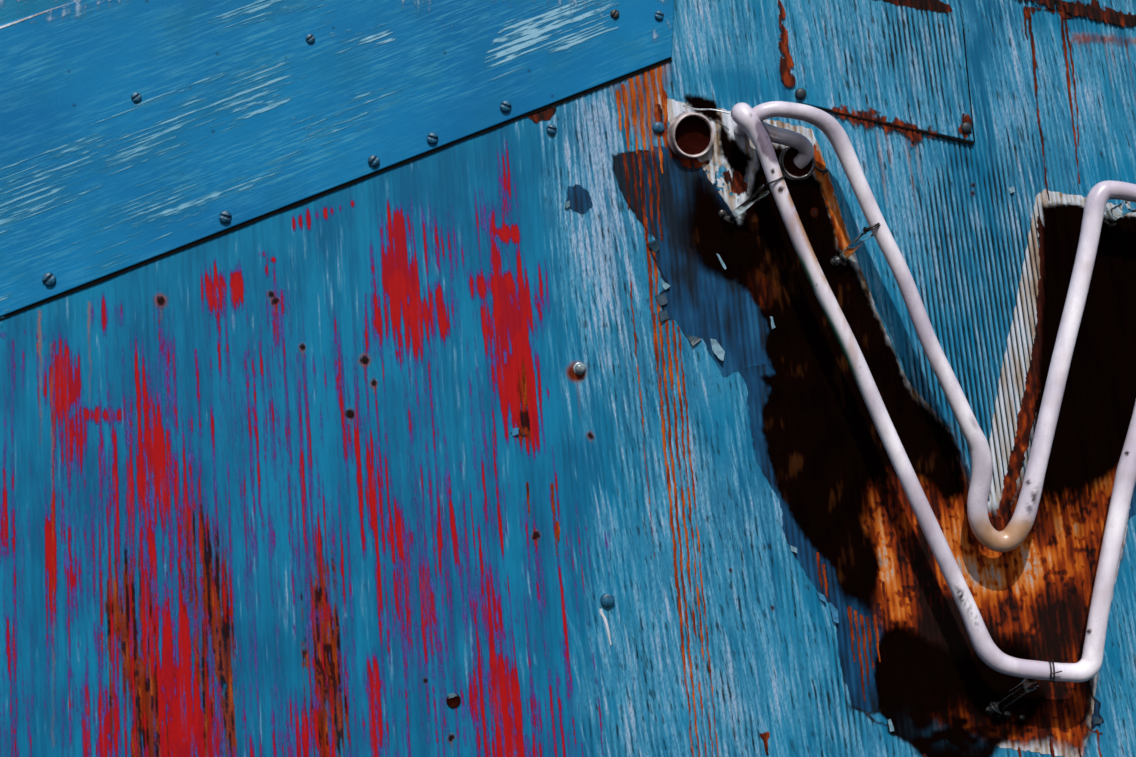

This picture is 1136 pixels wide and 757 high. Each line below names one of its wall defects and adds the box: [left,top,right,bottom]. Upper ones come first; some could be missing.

rust [1023,0,1136,201]
peeling [0,142,593,757]
rust [616,65,719,757]
peeling [613,94,894,732]
rust [847,471,975,701]
rust [988,216,1045,531]
rust [917,462,1117,663]
peeling [988,189,1086,511]
peeling [1110,483,1136,609]
peeling [593,654,603,755]
peeling [998,673,1104,757]
rust [1005,678,1103,757]